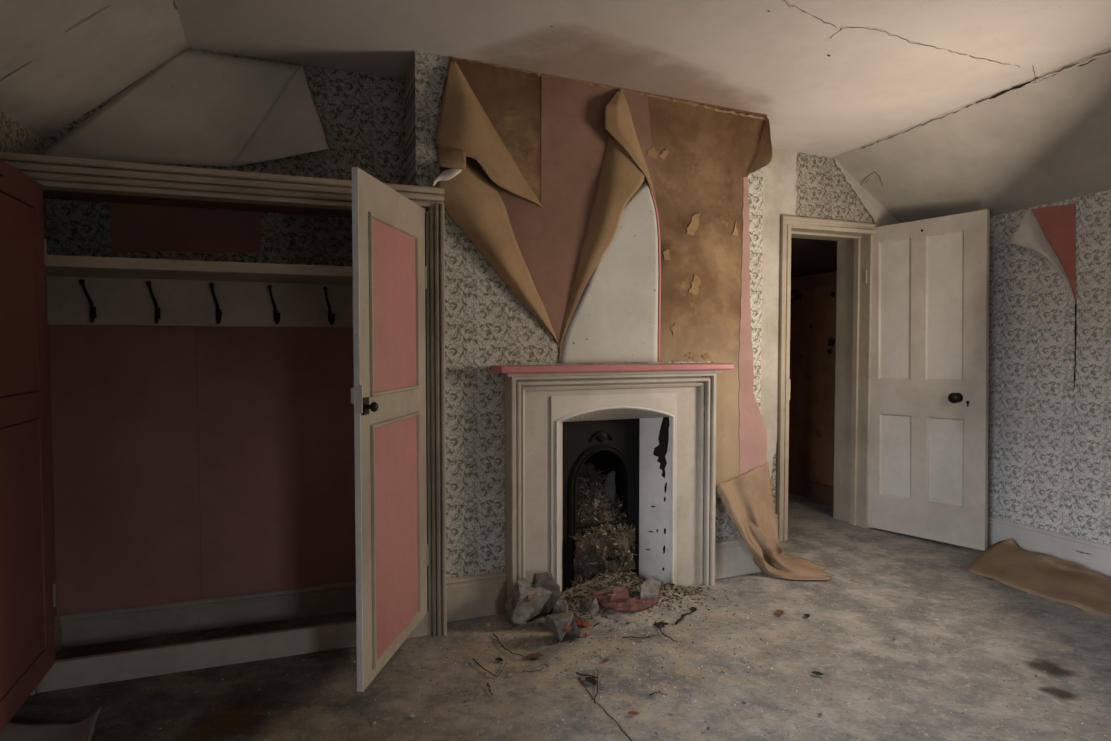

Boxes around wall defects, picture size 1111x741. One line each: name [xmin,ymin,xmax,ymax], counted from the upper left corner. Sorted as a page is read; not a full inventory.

crack [783,0,1036,77]
peeling [686,212,700,236]
flaking render [761,148,802,479]
spalling [651,417,669,508]
spalling [596,528,666,612]
crack [578,678,632,741]